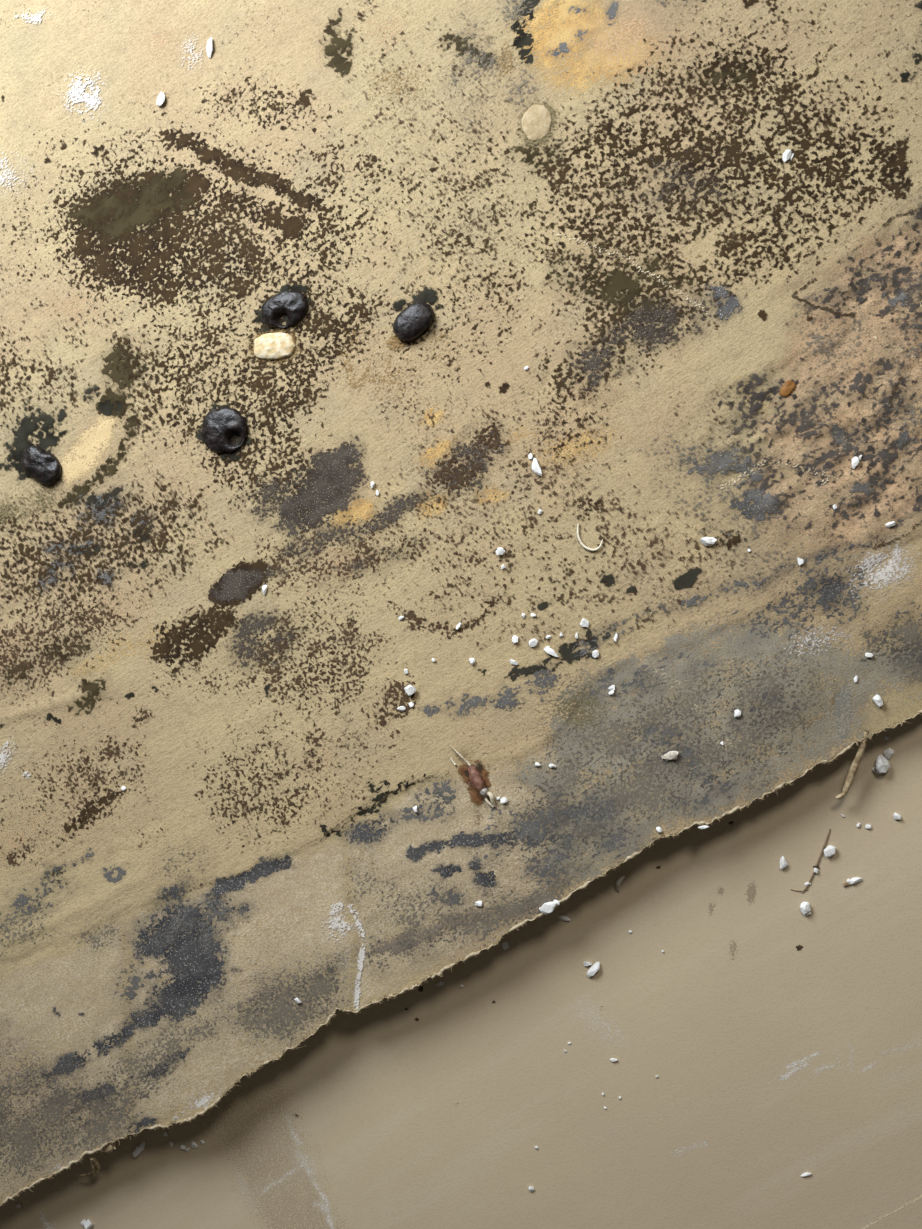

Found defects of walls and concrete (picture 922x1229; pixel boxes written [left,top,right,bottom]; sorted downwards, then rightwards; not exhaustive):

damp [0,0,922,981]
damp [0,846,354,1187]
peeling [0,742,570,1203]